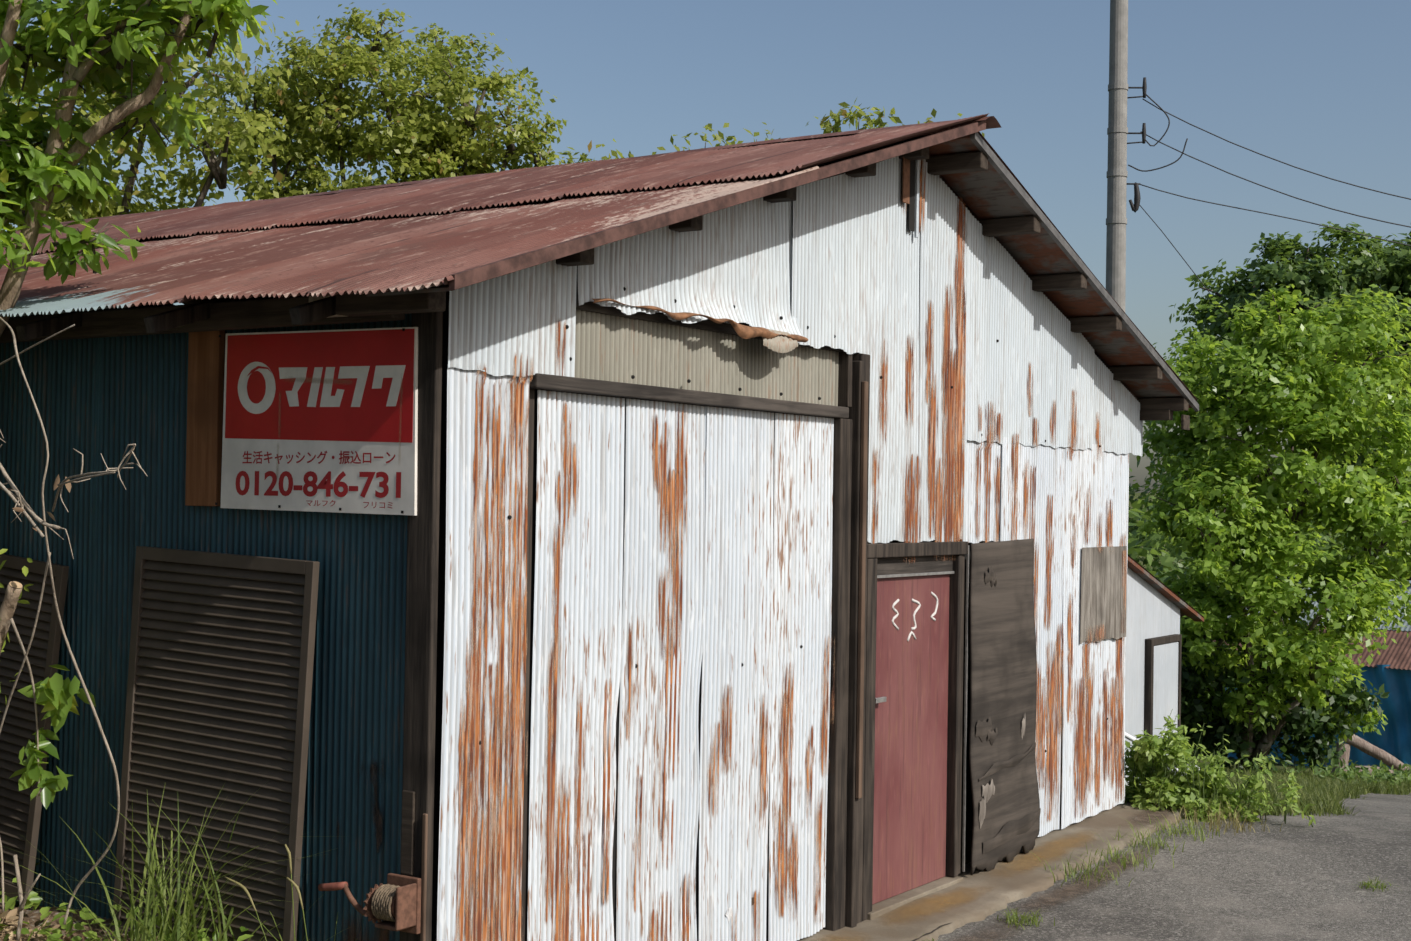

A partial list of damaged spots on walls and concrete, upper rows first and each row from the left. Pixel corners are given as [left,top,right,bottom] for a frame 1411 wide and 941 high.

corrosion [456,355,533,941]
corrosion [545,403,635,941]
corrosion [631,406,690,941]
corrosion [708,687,733,813]
corrosion [752,638,834,941]
corrosion [872,345,888,544]
corrosion [906,160,925,232]
corrosion [903,198,1127,821]